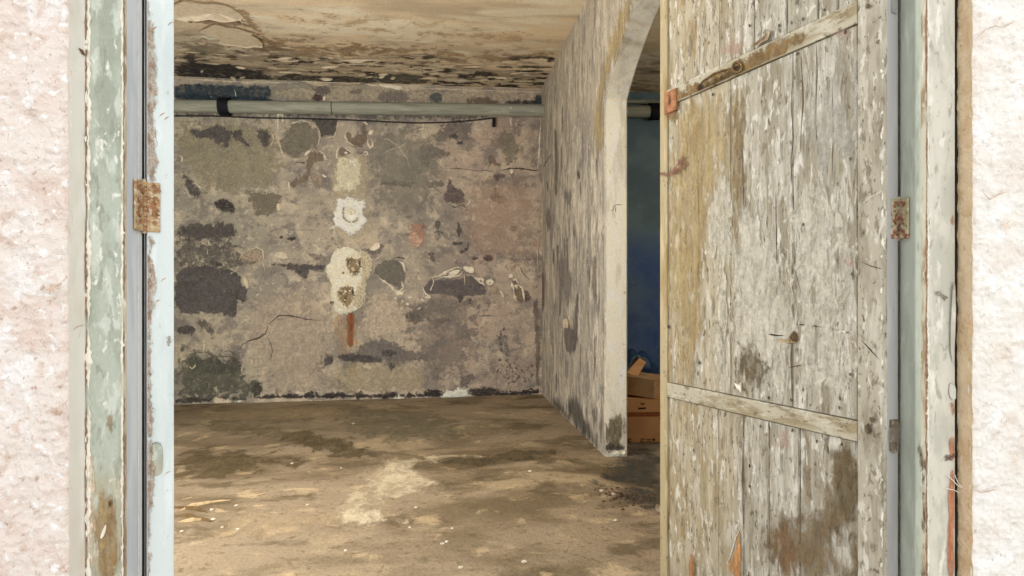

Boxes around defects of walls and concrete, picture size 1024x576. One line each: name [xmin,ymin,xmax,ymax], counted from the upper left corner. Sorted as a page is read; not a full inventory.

peeling [174,0,554,93]
crack [206,315,323,360]
leakage [174,106,612,525]
spalling [325,241,531,315]
leakage [554,375,625,453]